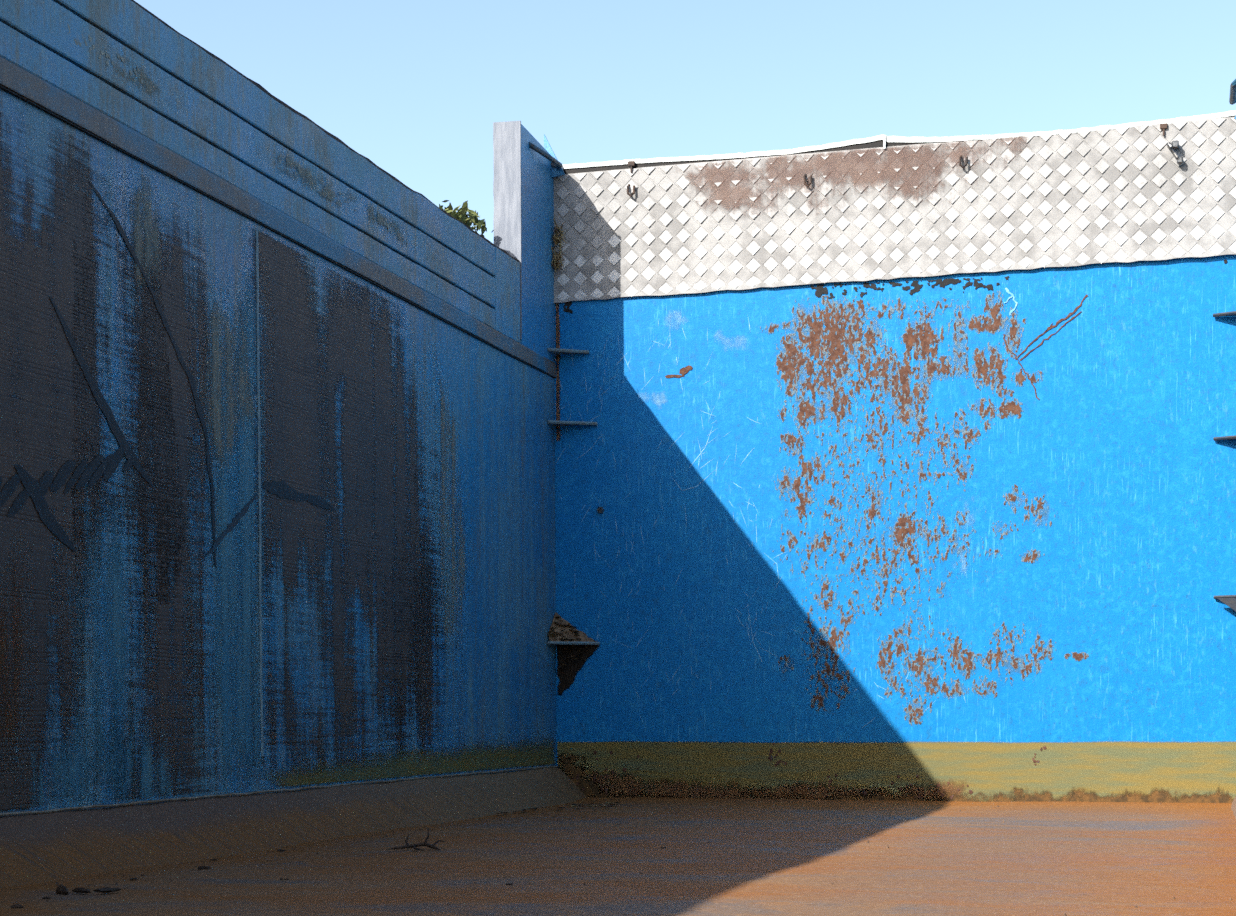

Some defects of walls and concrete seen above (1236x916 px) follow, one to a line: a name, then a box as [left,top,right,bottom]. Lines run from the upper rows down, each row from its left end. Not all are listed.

peeling [278,154,404,241]
rust [688,143,981,209]
leakage [271,741,1236,802]